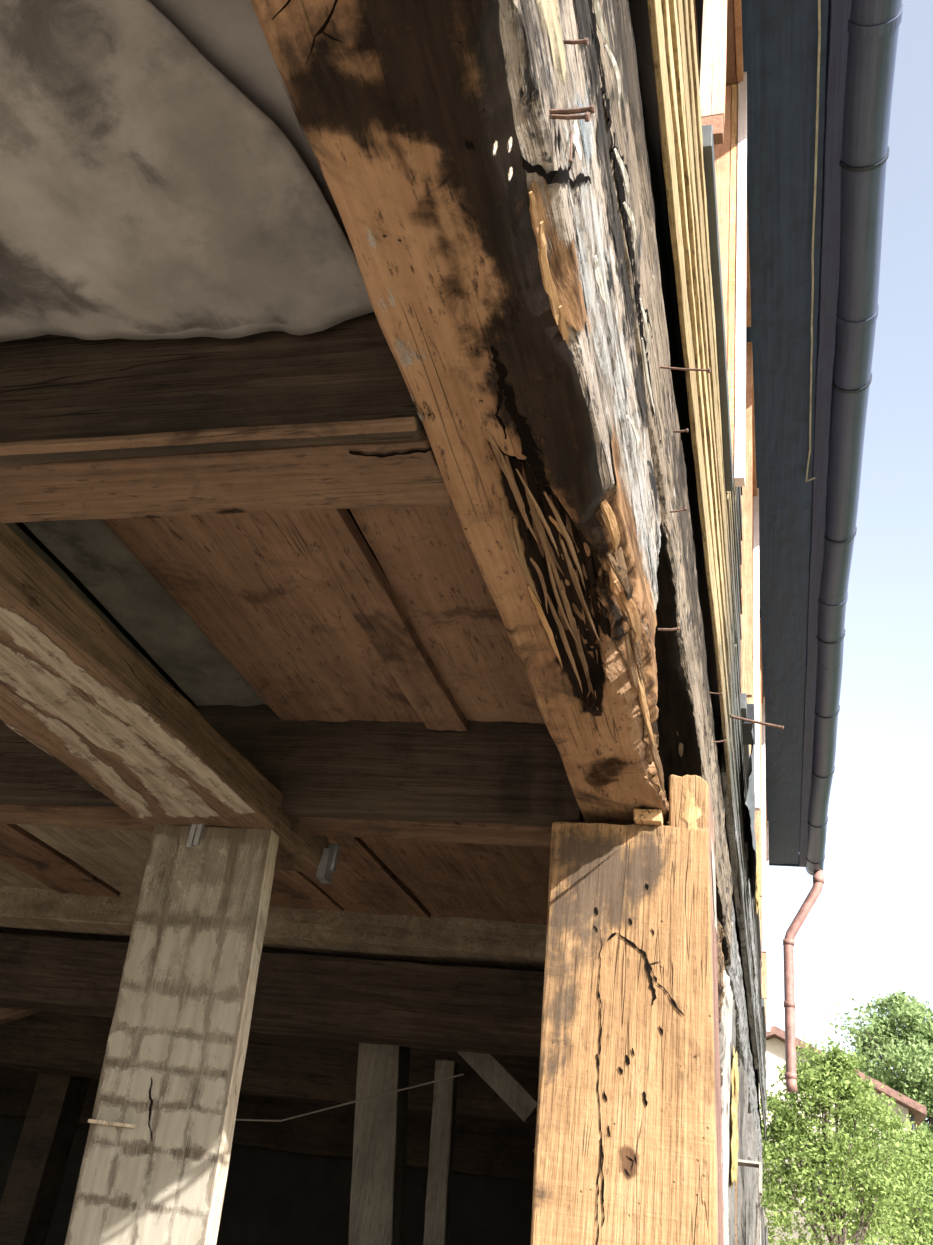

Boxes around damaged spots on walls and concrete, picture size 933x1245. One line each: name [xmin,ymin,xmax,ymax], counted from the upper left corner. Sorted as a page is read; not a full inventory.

crack [306,0,343,64]
peeling [592,0,621,107]
peeling [573,102,592,160]
crack [520,0,661,444]
peeling [614,148,637,250]
peeling [640,298,656,417]
peeling [626,415,639,458]
spalling [485,430,665,794]
crack [596,929,684,1245]